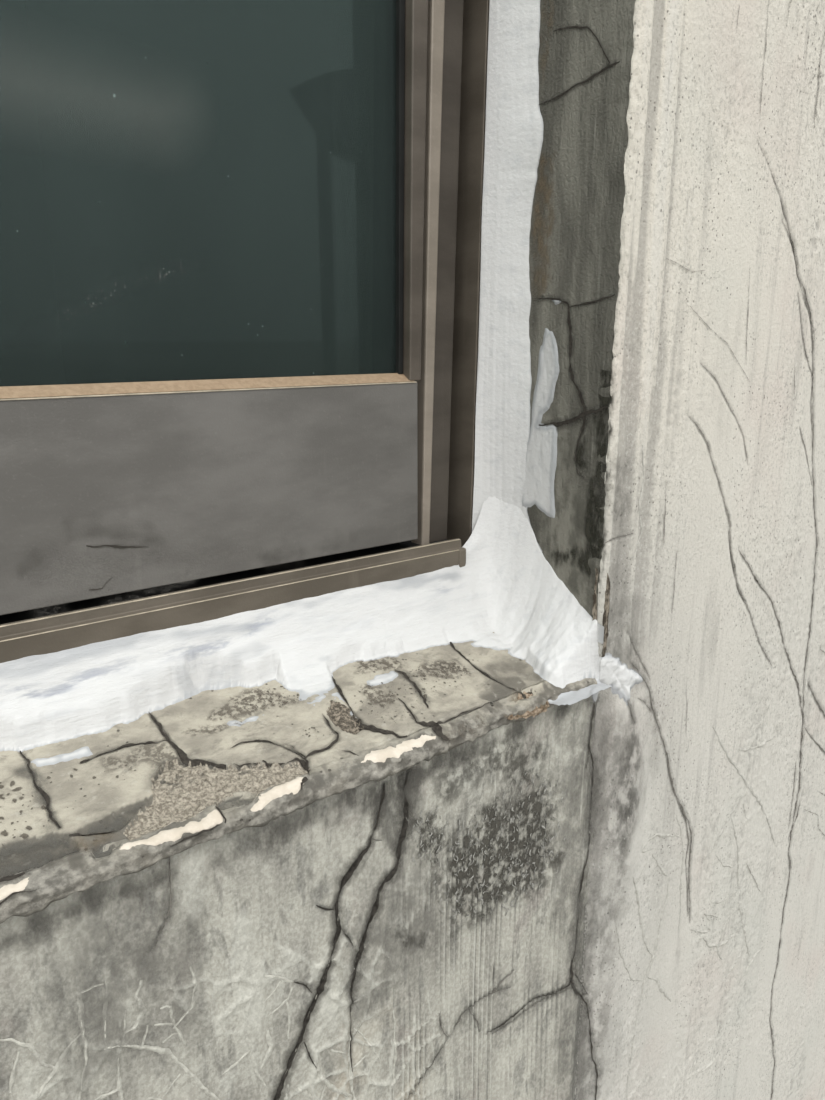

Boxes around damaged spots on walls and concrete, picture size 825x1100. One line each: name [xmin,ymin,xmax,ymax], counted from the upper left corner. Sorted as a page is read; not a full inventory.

peeling [522,328,559,518]
damp [554,370,613,575]
crack [686,139,825,1098]
flaking render [0,870,29,900]
crack [20,751,115,836]
damp [65,890,104,917]
spalling [113,759,310,850]
crack [80,670,480,790]
crack [272,769,411,1100]
spalling [303,665,466,739]
damp [338,722,540,854]
damp [447,792,563,920]